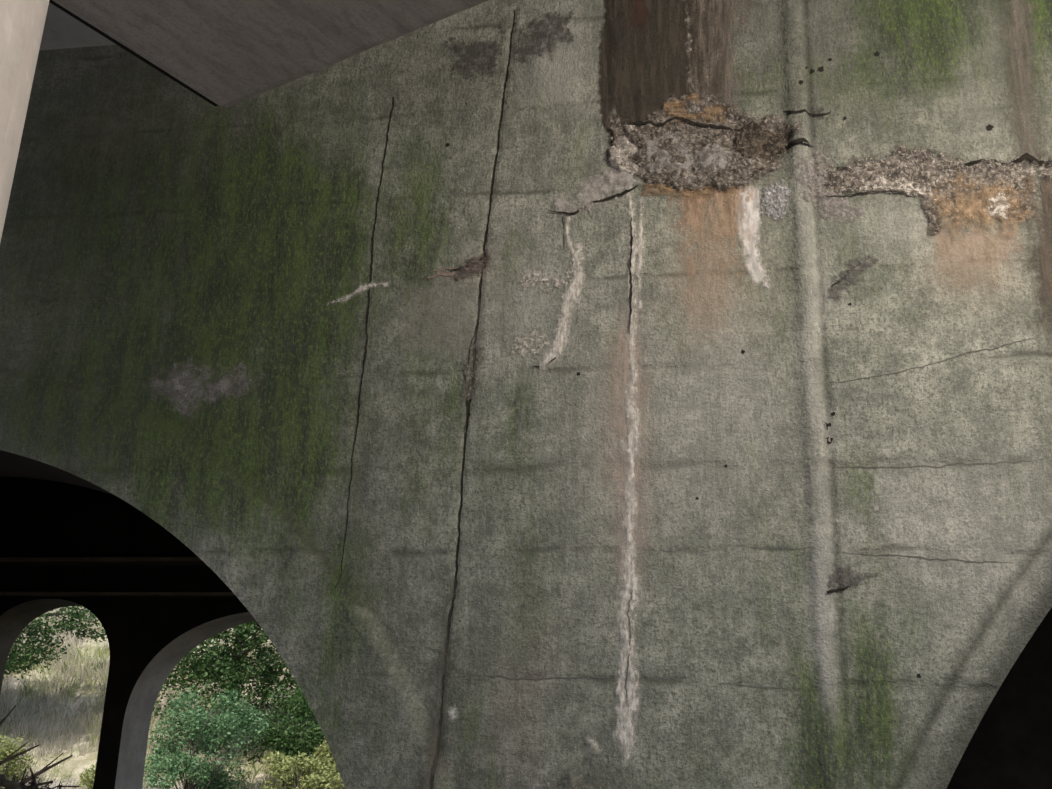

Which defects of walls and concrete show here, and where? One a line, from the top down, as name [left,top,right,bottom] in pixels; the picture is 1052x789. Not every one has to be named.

water stain [450,12,573,79]
water stain [599,0,751,146]
crack [335,97,394,589]
spalling [426,249,491,280]
crack [420,10,617,789]
water stain [511,213,584,370]
water stain [613,173,645,763]
water stain [738,187,768,287]
spalling [548,93,1052,236]